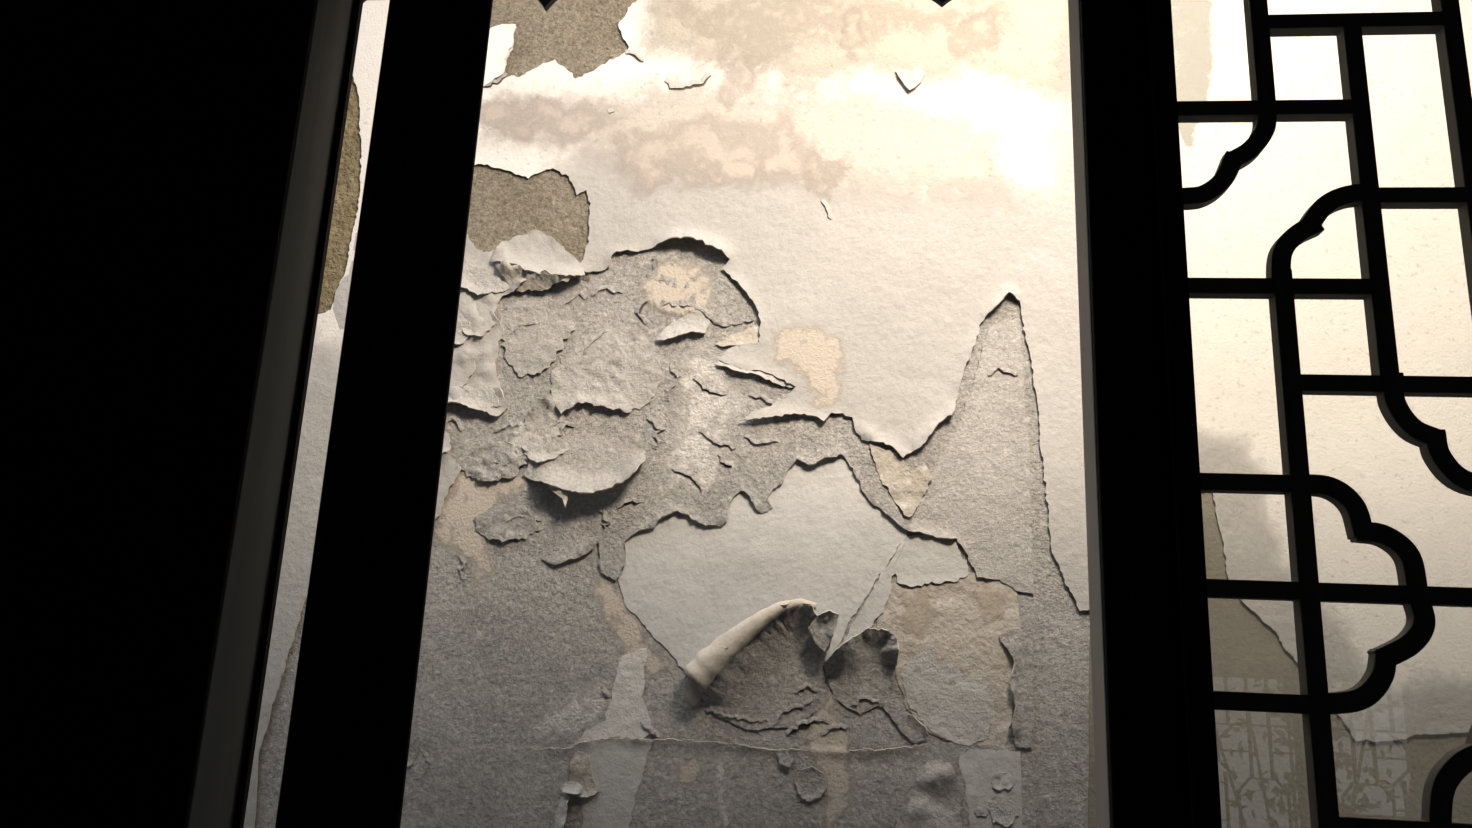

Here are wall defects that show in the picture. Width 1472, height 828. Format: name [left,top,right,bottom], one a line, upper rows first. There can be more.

spalling [483,0,637,87]
leakage [480,0,1070,194]
spalling [318,77,362,330]
peeling [243,347,340,828]
peeling [400,34,1089,828]
peeling [1198,437,1259,474]
peeling [1201,493,1291,581]
peeling [1322,616,1363,692]